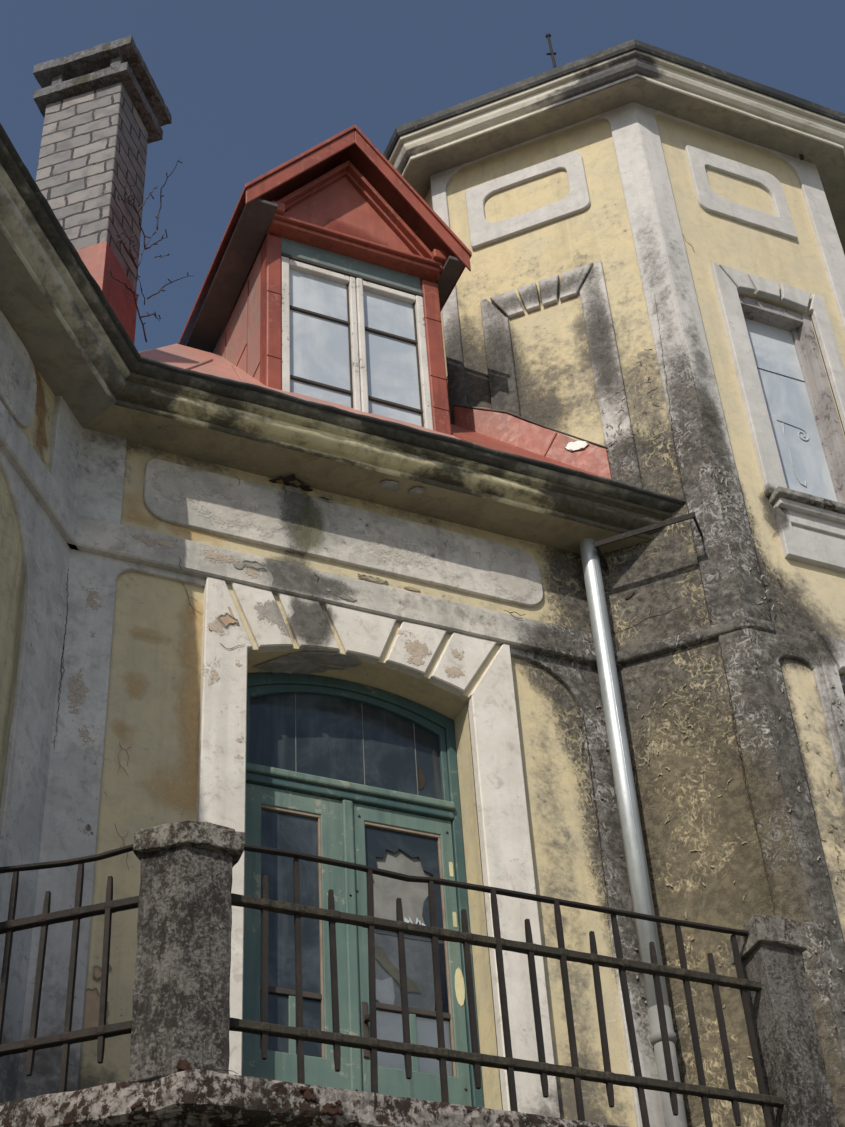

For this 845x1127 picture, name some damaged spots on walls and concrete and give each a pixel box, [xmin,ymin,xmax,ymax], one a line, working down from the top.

water stain [445,270,616,429]
crack [54,569,69,747]
peeling [209,607,239,636]
water stain [153,469,352,646]
peeling [397,630,431,666]
water stain [516,546,652,1048]
water stain [599,349,845,1127]
peeling [83,965,112,1029]